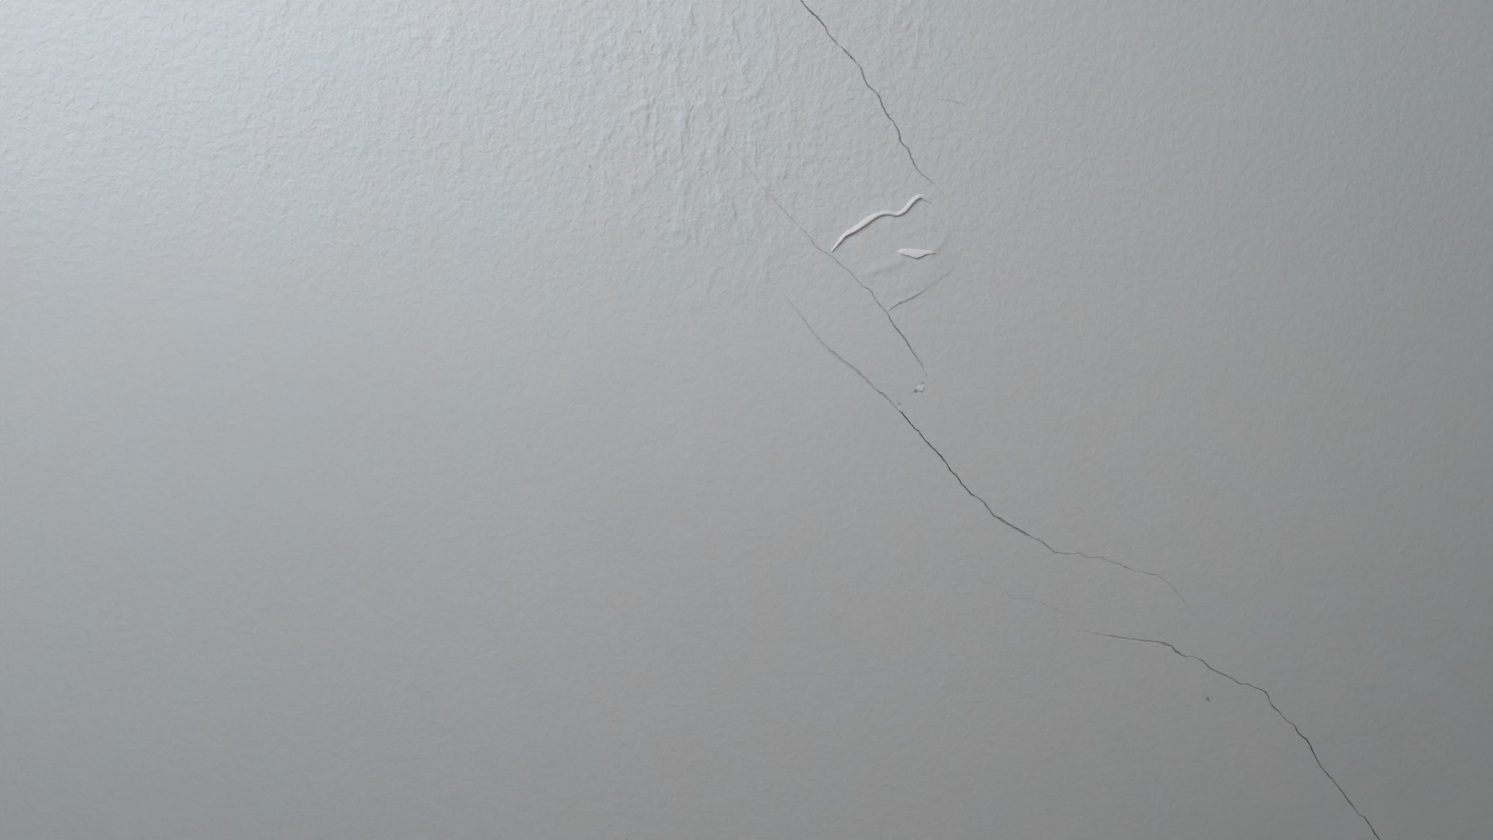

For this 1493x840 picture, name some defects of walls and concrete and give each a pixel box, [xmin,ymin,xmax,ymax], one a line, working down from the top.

crack [800,0,944,196]
crack [706,121,927,377]
crack [781,290,1189,611]
crack [1079,630,1380,840]